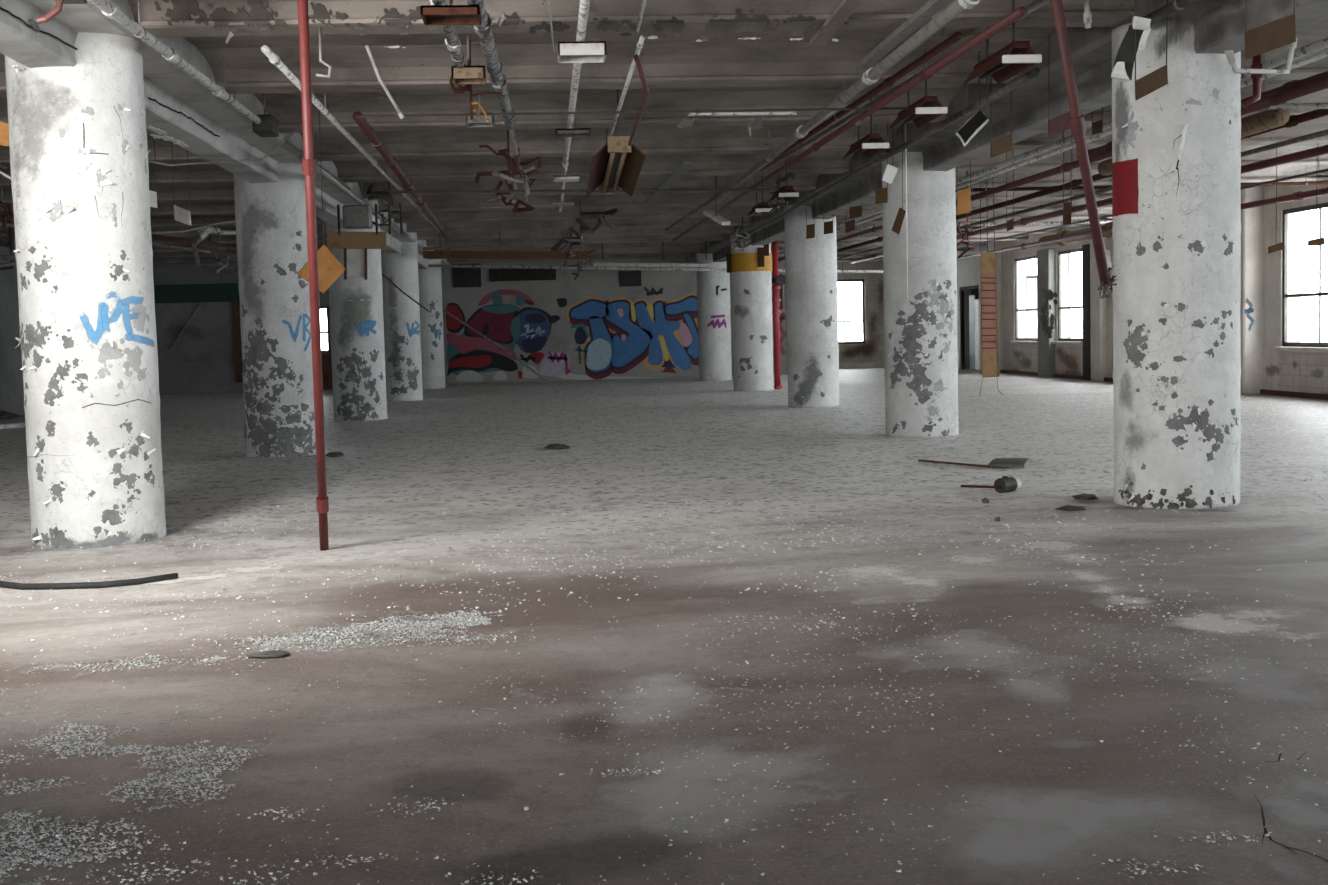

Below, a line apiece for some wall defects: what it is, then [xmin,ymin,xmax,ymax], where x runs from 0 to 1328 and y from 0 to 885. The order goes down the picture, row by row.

peeling [14,246,58,293]
peeling [110,250,130,281]
peeling [16,297,150,505]
peeling [241,305,316,458]
peeling [335,332,419,421]
peeling [887,278,956,437]
peeling [1123,302,1239,462]
peeling [86,419,156,541]
spalling [1119,481,1236,509]
damp [619,677,696,721]
damp [630,749,807,835]
crack [1254,795,1328,862]